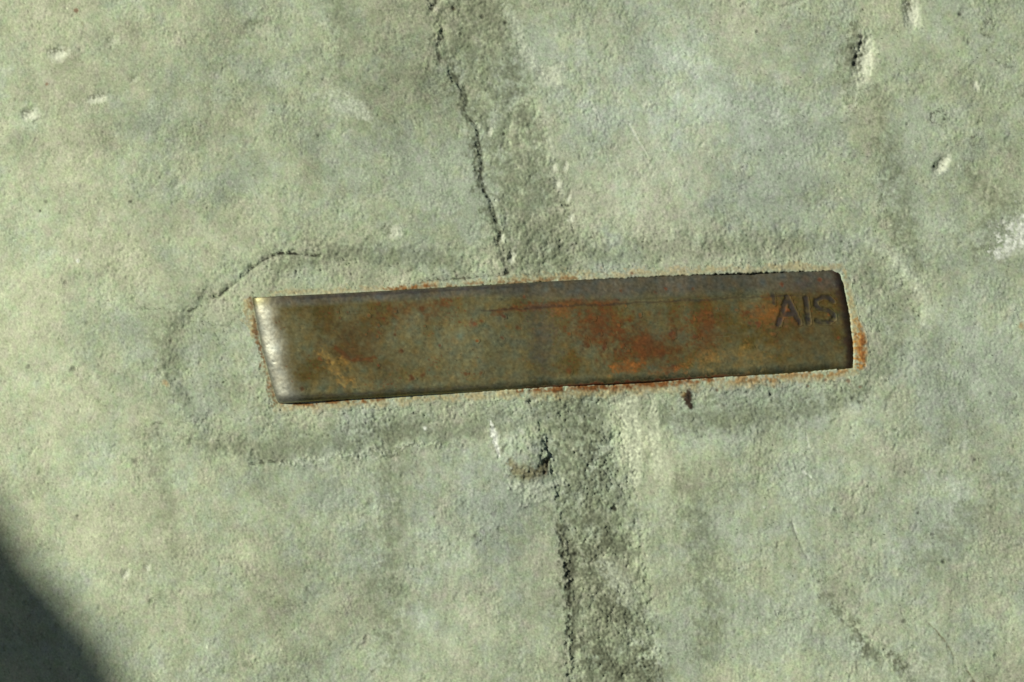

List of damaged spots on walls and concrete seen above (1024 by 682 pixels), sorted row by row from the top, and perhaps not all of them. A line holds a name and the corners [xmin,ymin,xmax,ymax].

crack [424,0,511,282]
crack [130,250,364,314]
rust [239,258,871,421]
crack [556,528,587,678]